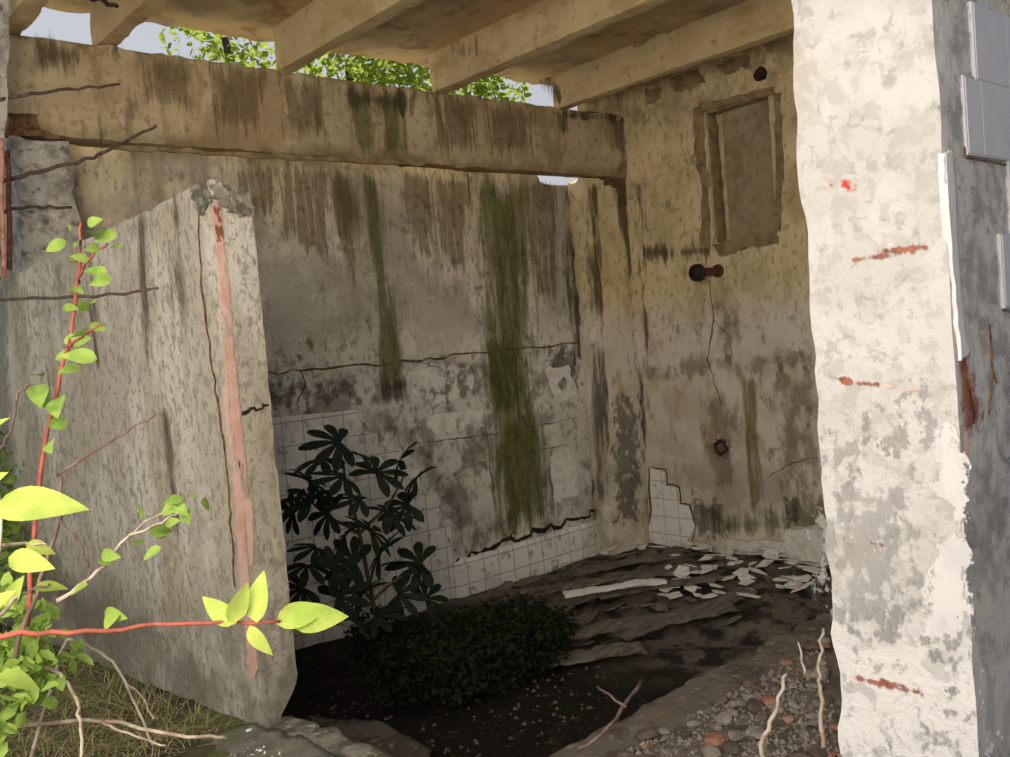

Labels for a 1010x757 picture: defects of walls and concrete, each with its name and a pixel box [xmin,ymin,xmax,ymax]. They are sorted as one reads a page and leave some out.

water stain [36,39,76,69]
water stain [347,87,415,149]
spalling [191,179,255,217]
rust [852,245,927,262]
water stain [337,176,406,402]
rust [212,202,254,590]
crack [197,213,269,587]
water stain [468,179,554,531]
rust [838,376,894,389]
spalling [966,379,976,424]
crack [416,417,595,565]
rust [855,674,923,697]